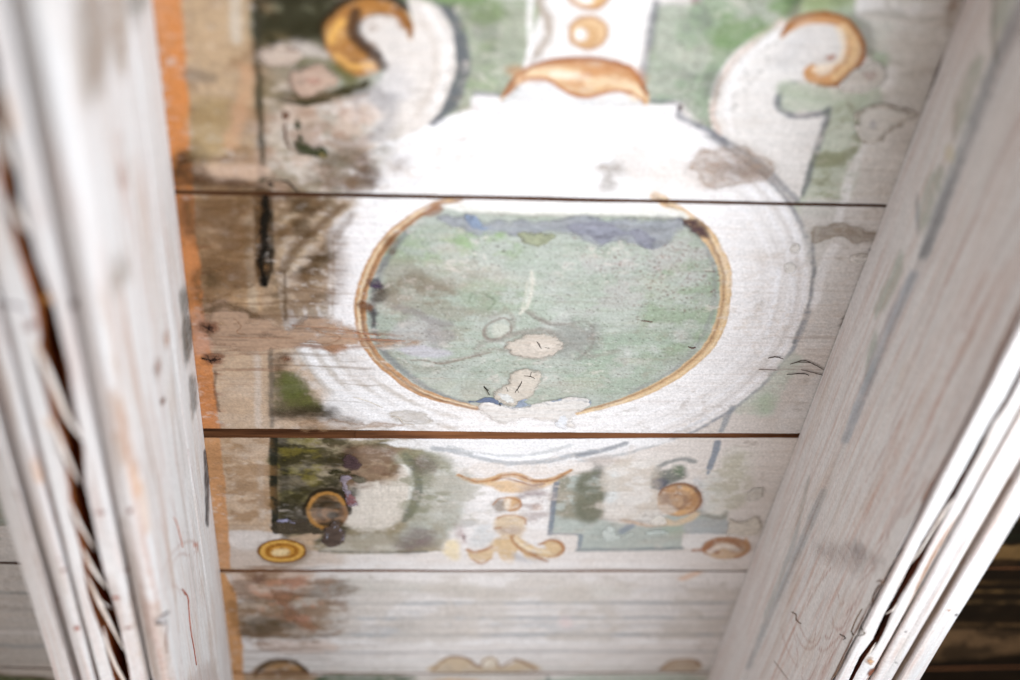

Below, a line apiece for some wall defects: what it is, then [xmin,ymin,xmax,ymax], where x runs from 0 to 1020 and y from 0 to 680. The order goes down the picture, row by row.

damp [178,167,252,188]
damp [181,194,270,356]
damp [370,281,385,326]
peeling [469,333,591,430]
crack [831,368,1020,680]